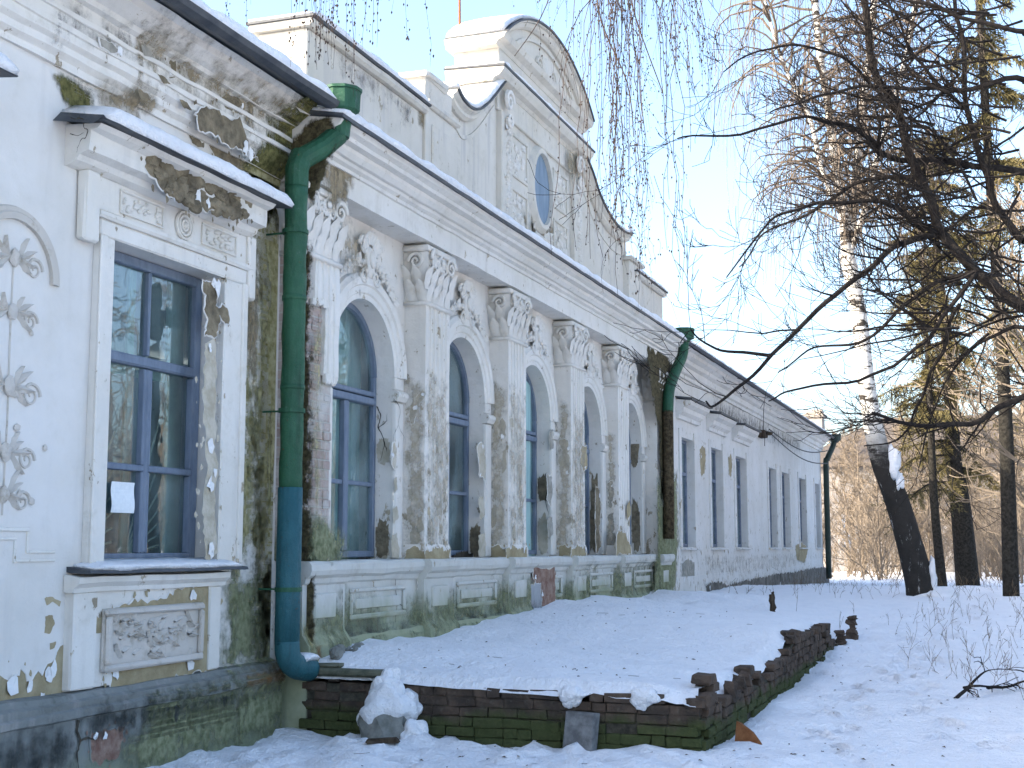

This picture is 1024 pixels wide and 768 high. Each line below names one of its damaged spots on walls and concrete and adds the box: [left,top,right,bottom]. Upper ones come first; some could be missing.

leakage [81,85,156,113]
spalling [179,92,259,176]
spalling [140,155,253,231]
leakage [244,163,285,190]
leakage [325,165,353,205]
spalling [194,276,231,560]
leakage [242,208,279,664]
spalling [375,417,640,608]
spalling [0,597,64,701]
spalling [102,586,223,688]
leakage [0,732,72,768]
leakage [92,689,246,746]